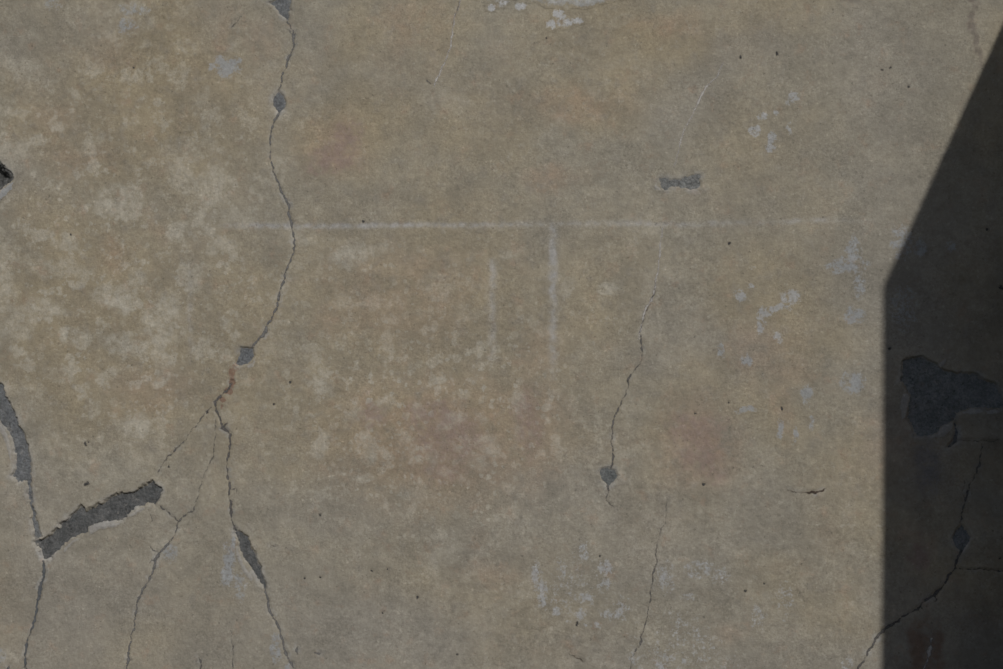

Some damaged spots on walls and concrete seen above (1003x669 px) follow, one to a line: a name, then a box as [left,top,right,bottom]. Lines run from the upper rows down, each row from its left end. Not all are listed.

crack [280,21,296,88]
peeling [0,181,15,202]
crack [252,113,296,347]
flaking render [653,174,701,192]
flaking render [0,383,162,559]
crack [158,383,236,529]
crack [606,320,644,506]
crack [7,560,46,669]
crack [126,497,198,669]
crack [264,587,320,668]
crack [635,528,662,652]
crack [857,550,1003,669]